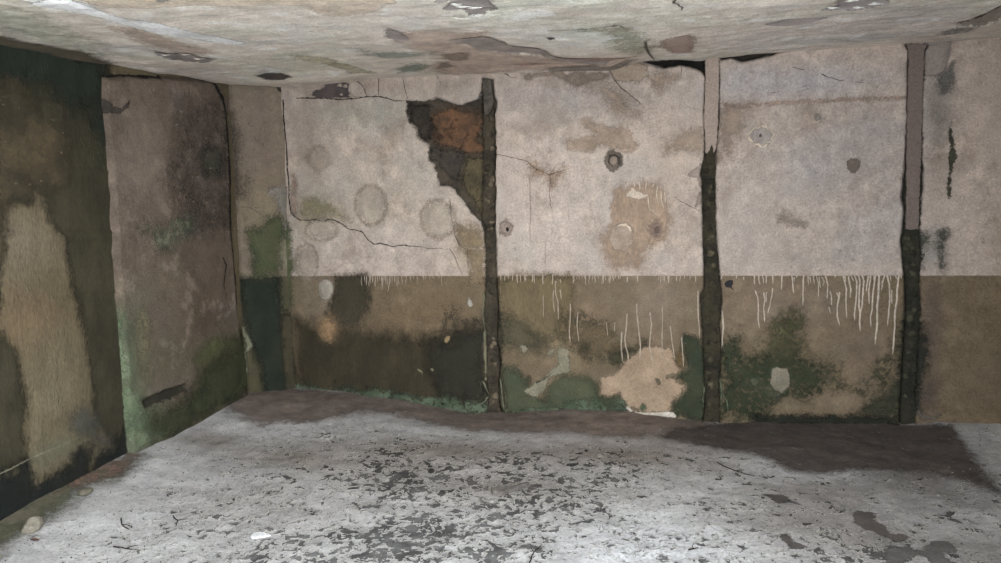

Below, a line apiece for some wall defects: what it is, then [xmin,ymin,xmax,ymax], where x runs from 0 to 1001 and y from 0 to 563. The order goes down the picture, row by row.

leakage [0,36,111,76]
spalling [155,52,214,63]
peeling [21,0,395,45]
peeling [312,82,353,98]
spalling [434,0,498,20]
crack [282,77,482,282]
spalling [405,93,497,221]
leakage [0,76,128,521]
leakage [291,224,548,413]
leakage [500,182,684,367]
peeling [599,346,685,418]
leakage [736,275,906,389]